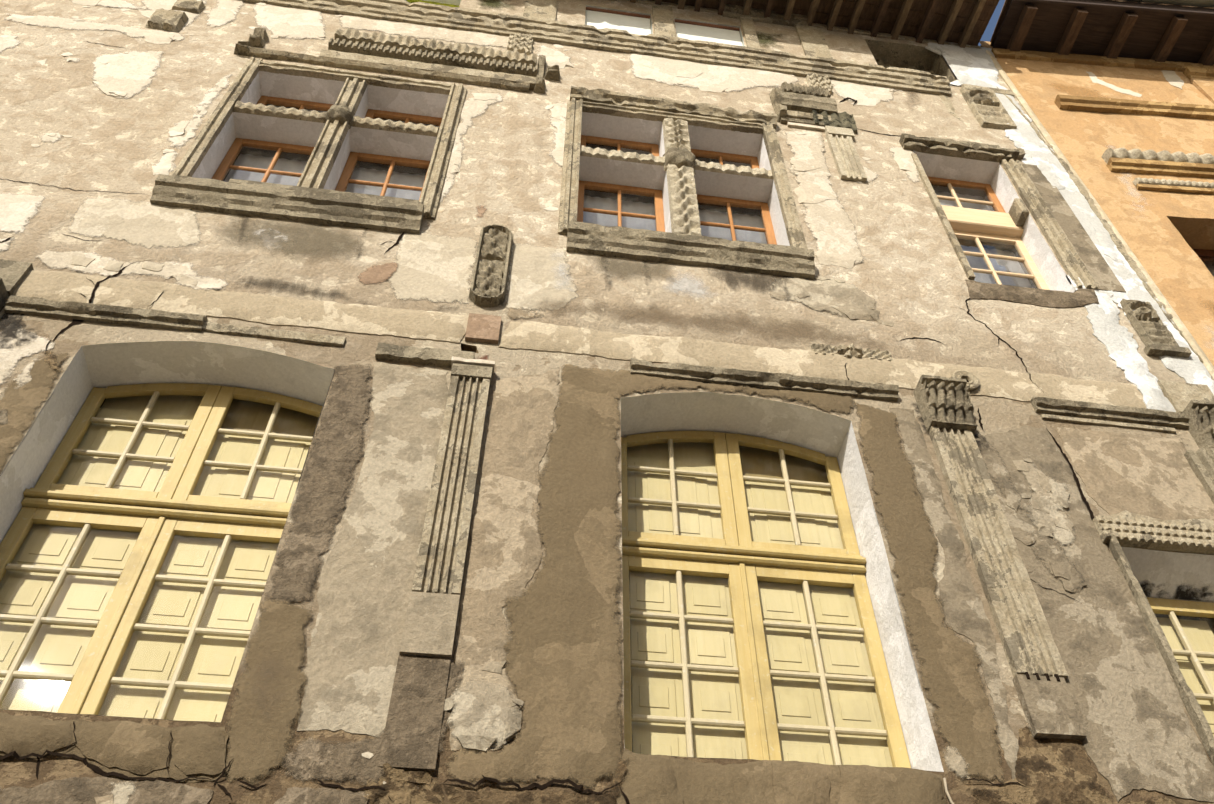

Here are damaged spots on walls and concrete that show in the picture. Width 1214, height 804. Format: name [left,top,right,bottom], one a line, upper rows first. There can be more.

flaking render [0,0,509,99]
flaking render [630,53,798,93]
flaking render [831,79,903,106]
crack [45,260,153,354]
spalling [35,250,227,290]
crack [380,232,405,253]
crack [958,298,1044,393]
flaking render [974,431,1087,593]
crack [1046,428,1109,549]
flaking render [443,660,524,752]
crack [0,722,267,800]
crack [442,775,630,804]